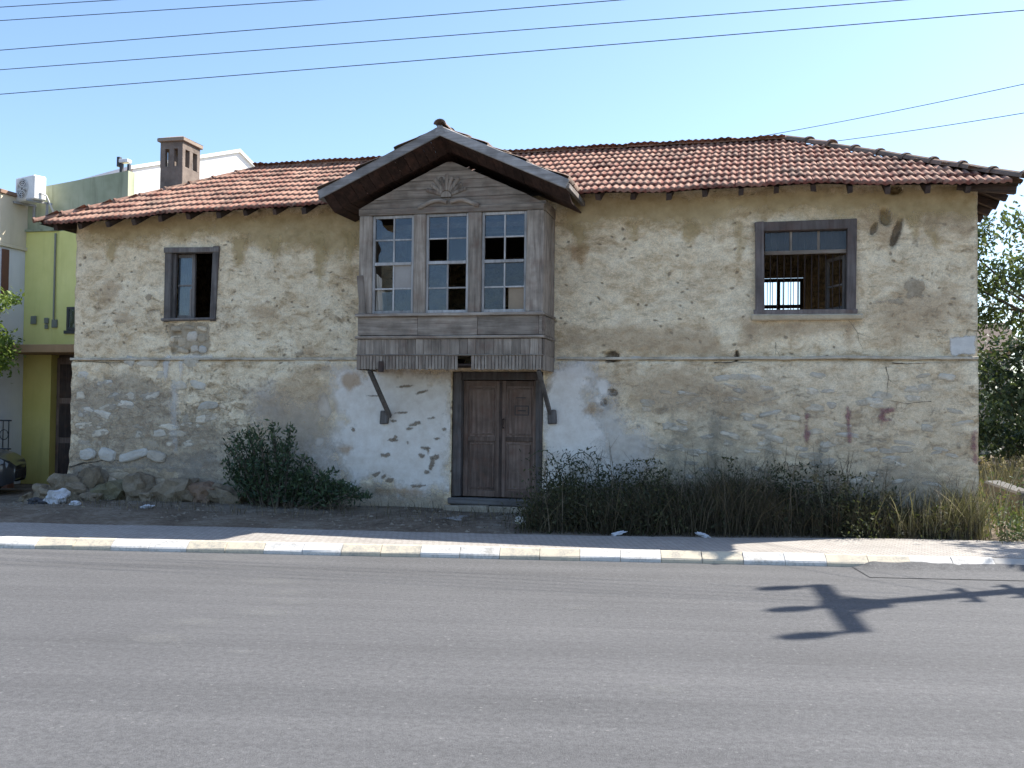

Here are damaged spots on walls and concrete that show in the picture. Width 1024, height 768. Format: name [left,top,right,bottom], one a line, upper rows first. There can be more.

spalling [870,211,903,246]
flaking render [75,321,219,463]
crack [886,362,931,408]
peeling [257,395,338,474]
spalling [381,412,420,457]
spalling [411,428,446,487]
flaking render [590,372,959,487]